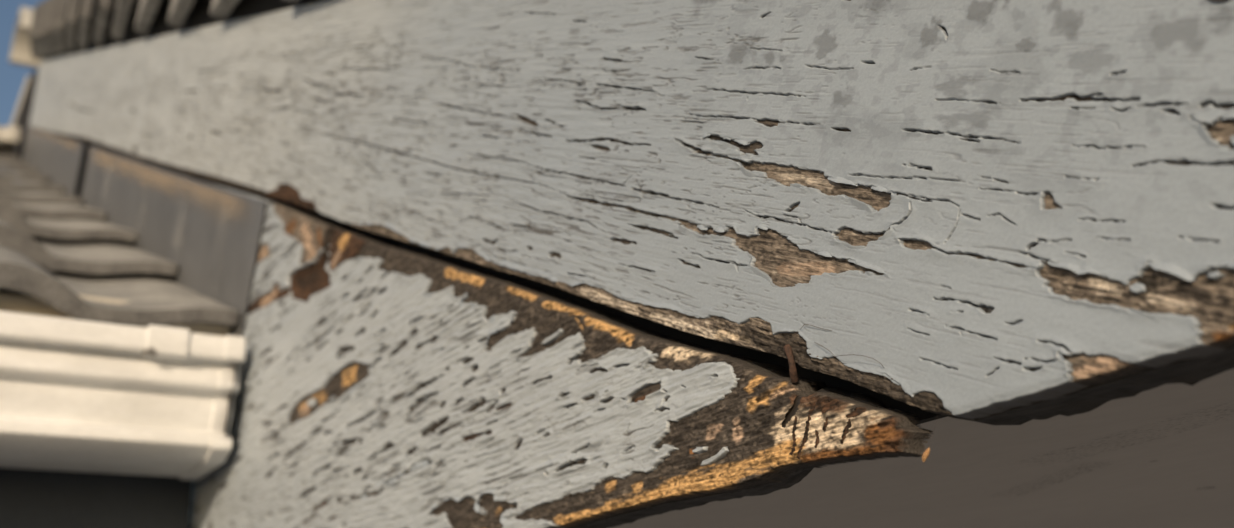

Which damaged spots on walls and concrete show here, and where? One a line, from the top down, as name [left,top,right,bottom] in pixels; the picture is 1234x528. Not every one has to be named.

crack [698,49,851,132]
crack [939,72,1234,115]
crack [262,58,744,272]
peeling [683,133,937,213]
crack [908,130,1016,143]
crack [1093,146,1234,167]
crack [759,216,828,232]
peeling [635,209,1106,288]
peeling [1148,261,1195,281]
peeling [1042,341,1163,386]
peeling [288,361,371,427]
peeling [629,383,661,405]